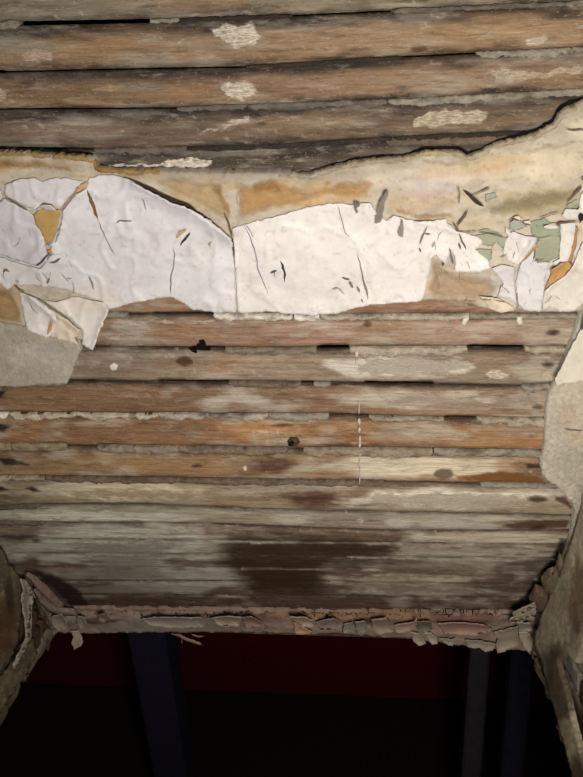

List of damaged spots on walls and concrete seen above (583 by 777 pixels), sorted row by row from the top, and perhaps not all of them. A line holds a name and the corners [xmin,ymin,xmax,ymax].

flaking render [278,99,583,180]
peeling [0,149,583,387]
leakage [506,520,568,529]
flaking render [0,549,88,715]
leakage [33,571,87,606]
peeling [140,616,267,629]
leakage [224,535,395,595]
flaking render [289,493,583,777]
leakage [513,540,565,609]